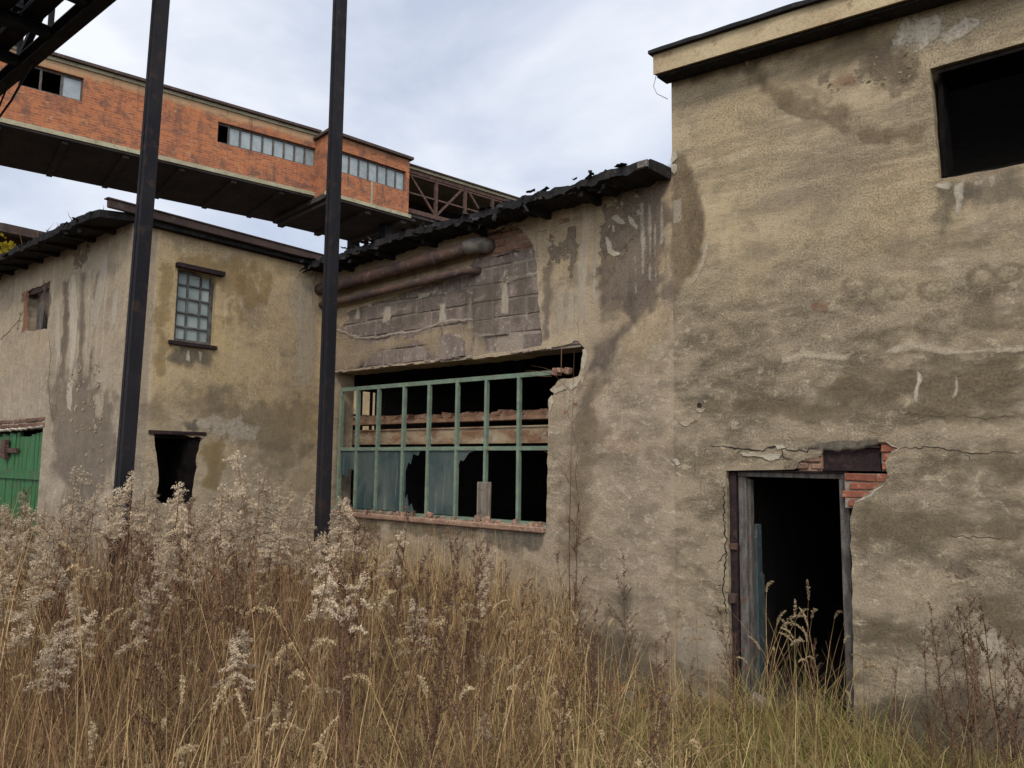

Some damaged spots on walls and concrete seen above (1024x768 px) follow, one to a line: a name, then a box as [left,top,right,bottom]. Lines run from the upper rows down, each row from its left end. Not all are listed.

peeling [826,12,980,91]
damp [731,61,922,143]
peeling [599,191,646,284]
damp [589,157,709,371]
damp [42,254,118,383]
spalling [335,218,588,413]
spalling [797,455,825,471]
crack [713,439,1024,461]
spalling [842,441,899,508]